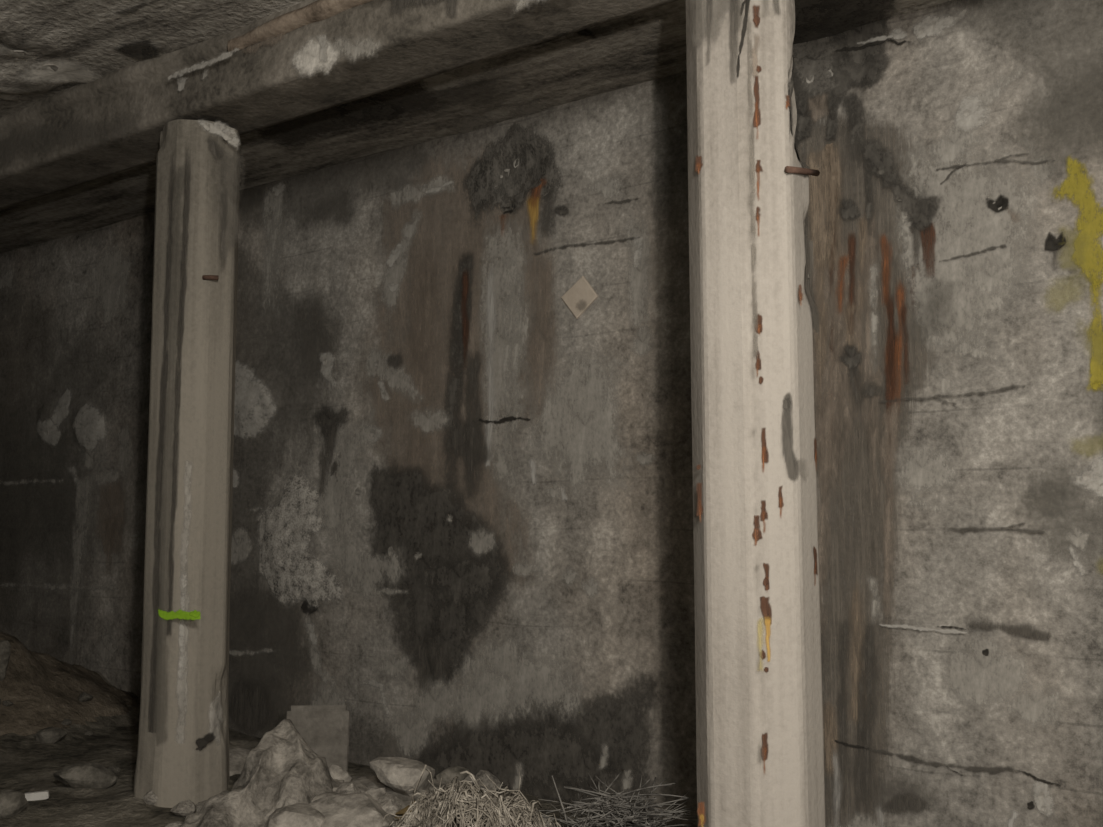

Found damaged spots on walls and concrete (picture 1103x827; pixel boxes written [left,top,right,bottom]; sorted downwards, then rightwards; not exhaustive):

water stain [730,0,738,80]
rust [752,5,761,128]
crack [936,153,1055,184]
water stain [363,155,656,811]
rust [761,428,769,469]
rust [752,486,784,545]
water stain [782,393,798,480]
water stain [792,0,1059,827]
crack [880,385,1025,405]
crack [953,523,1044,534]
rust [758,563,772,672]
crack [835,740,1061,786]